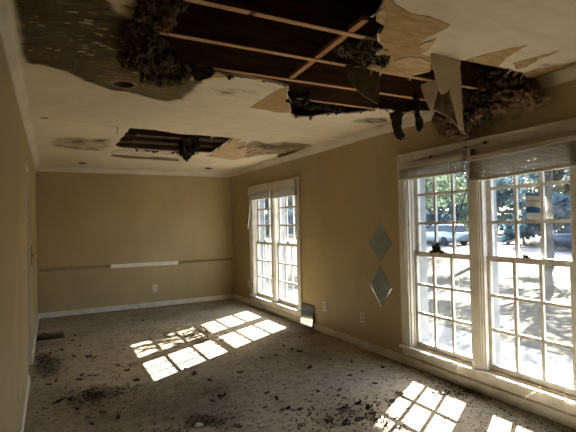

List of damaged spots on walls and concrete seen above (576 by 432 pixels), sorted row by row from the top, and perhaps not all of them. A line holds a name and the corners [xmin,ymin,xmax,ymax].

water stain [14,0,202,101]